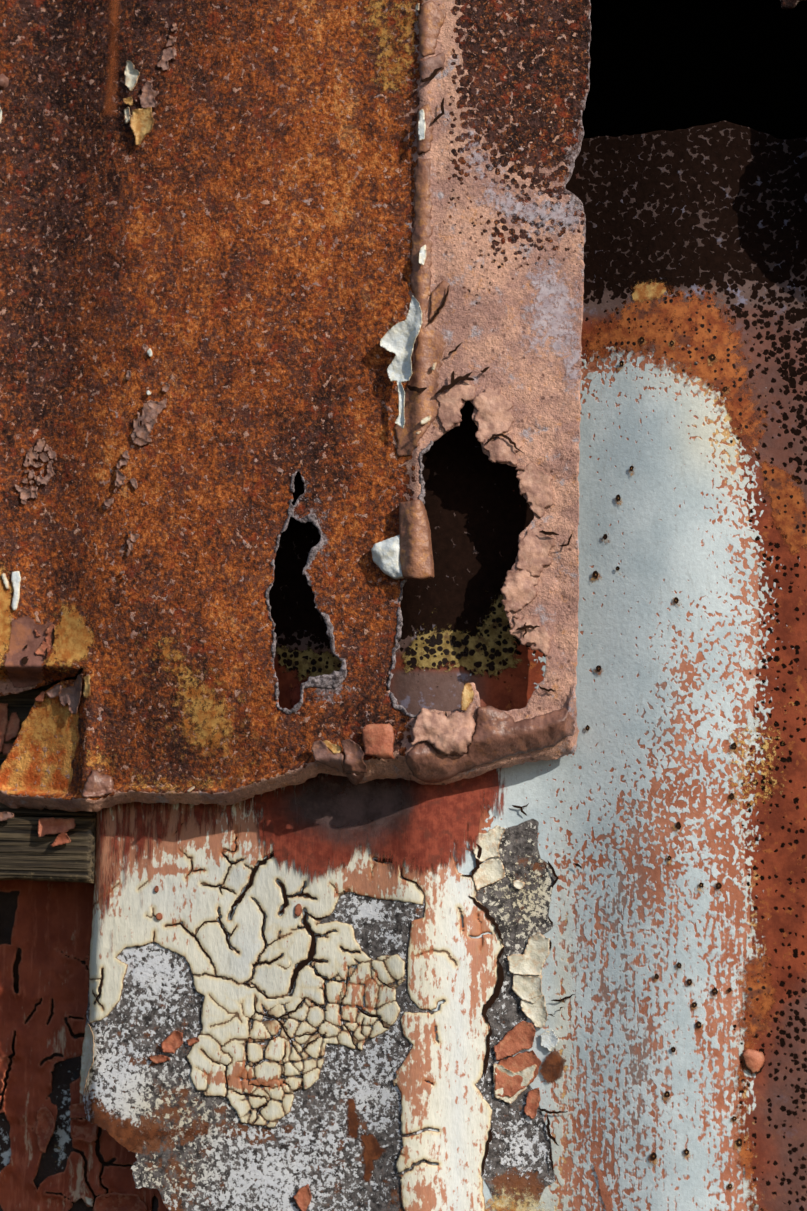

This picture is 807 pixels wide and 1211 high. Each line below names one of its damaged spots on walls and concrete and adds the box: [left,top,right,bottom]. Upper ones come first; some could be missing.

peeling [380,295,431,435]
corrosion [0,0,807,923]
peeling [1,571,21,611]
peeling [461,683,474,711]
crack [372,858,424,894]
crack [1,951,104,1105]
crack [153,824,394,1125]
peeling [0,785,567,1211]
corrosion [734,954,776,1211]
corrosion [485,1196,528,1211]
corrosion [594,1163,614,1211]